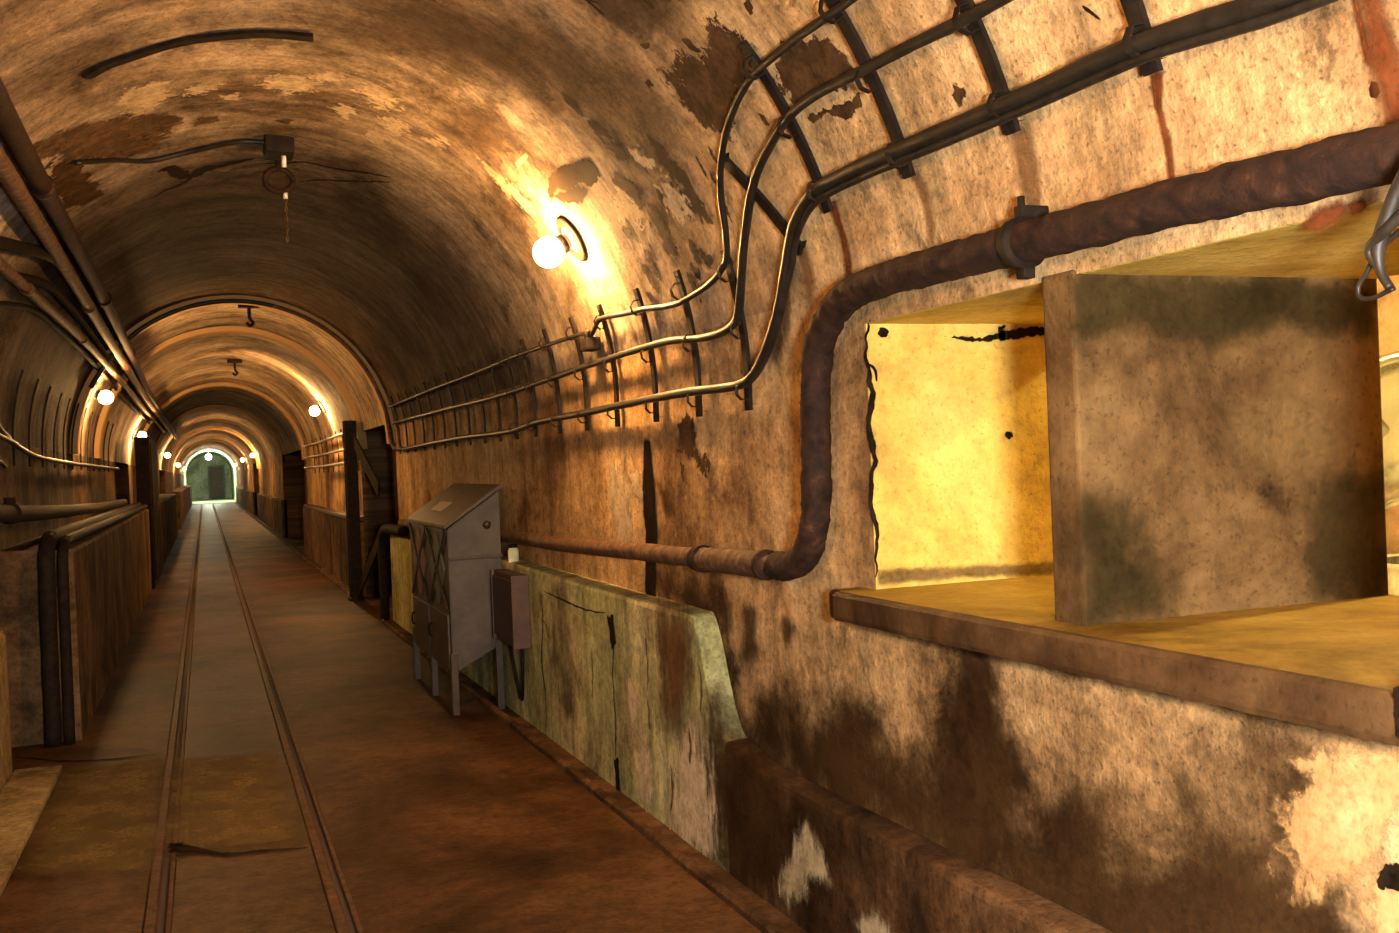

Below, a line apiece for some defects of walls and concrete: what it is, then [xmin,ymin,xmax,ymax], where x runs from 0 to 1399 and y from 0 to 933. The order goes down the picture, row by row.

spalling [34,79,242,209]
spalling [547,11,752,303]
spalling [773,35,863,123]
corrosion [913,173,933,241]
corrosion [1013,131,1038,205]
corrosion [1150,71,1174,179]
corrosion [1306,199,1367,232]
corrosion [1353,0,1399,126]
water stain [878,562,1054,584]
water stain [656,568,1355,933]
peeling [1275,686,1399,933]
peeling [779,824,828,908]